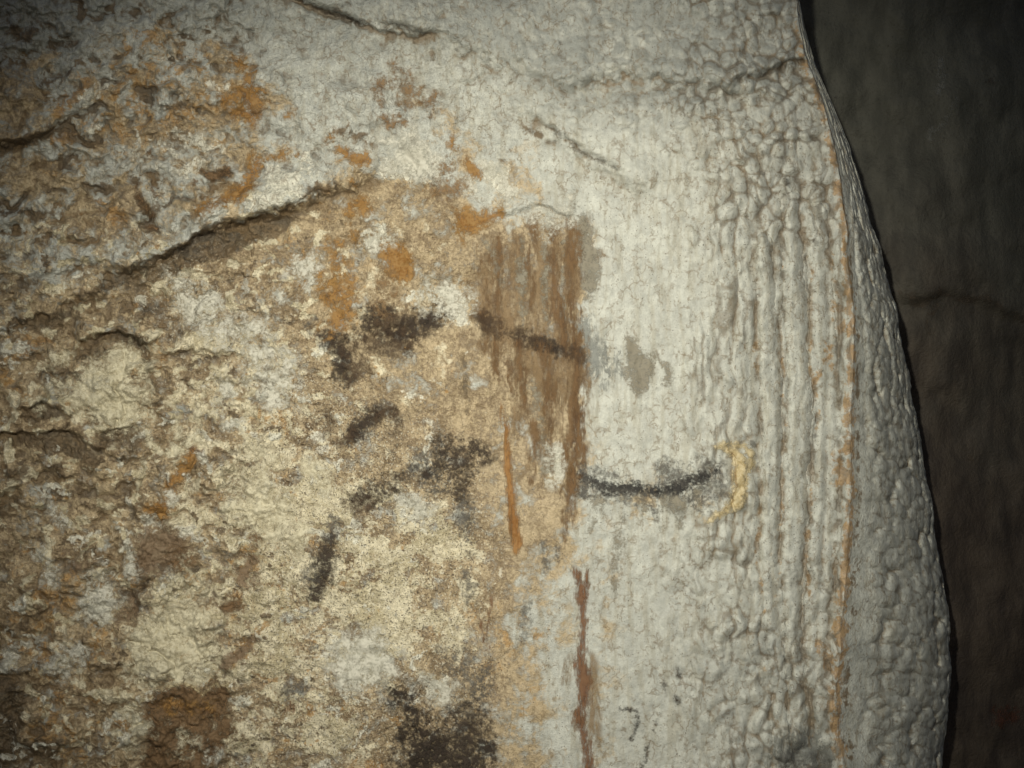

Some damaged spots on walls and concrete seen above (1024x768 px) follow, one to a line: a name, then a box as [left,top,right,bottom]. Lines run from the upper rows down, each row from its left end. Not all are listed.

corrosion [372,57,437,130]
corrosion [429,137,591,554]
corrosion [564,568,599,768]